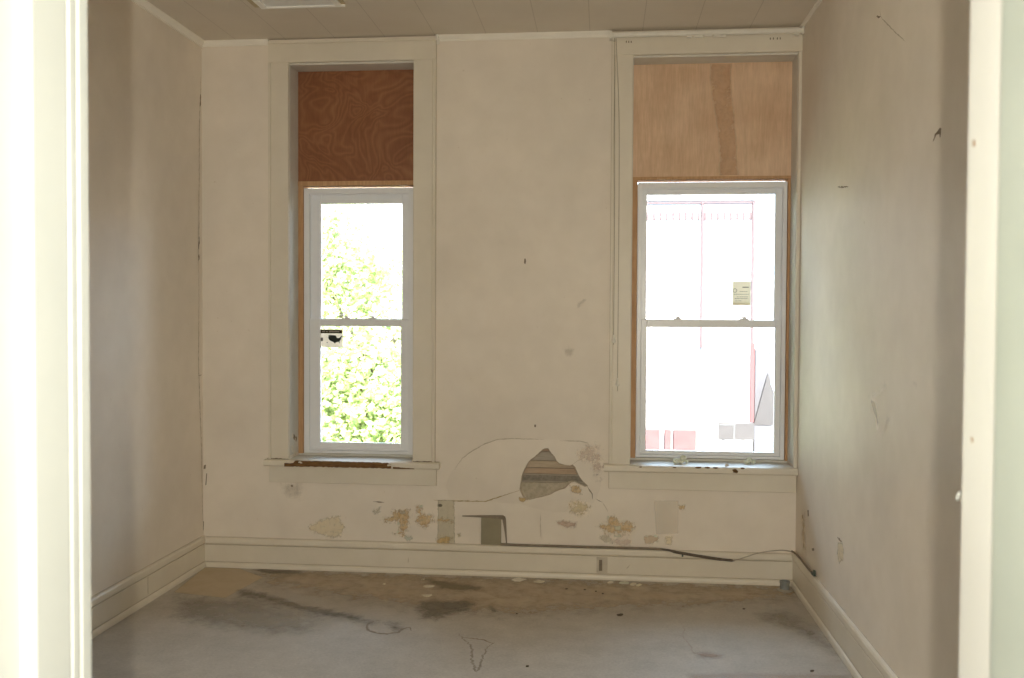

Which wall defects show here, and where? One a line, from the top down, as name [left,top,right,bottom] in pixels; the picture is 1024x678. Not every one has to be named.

peeling [284,433,414,469]
flaking render [519,448,588,500]
peeling [382,505,433,537]
peeling [598,516,672,545]